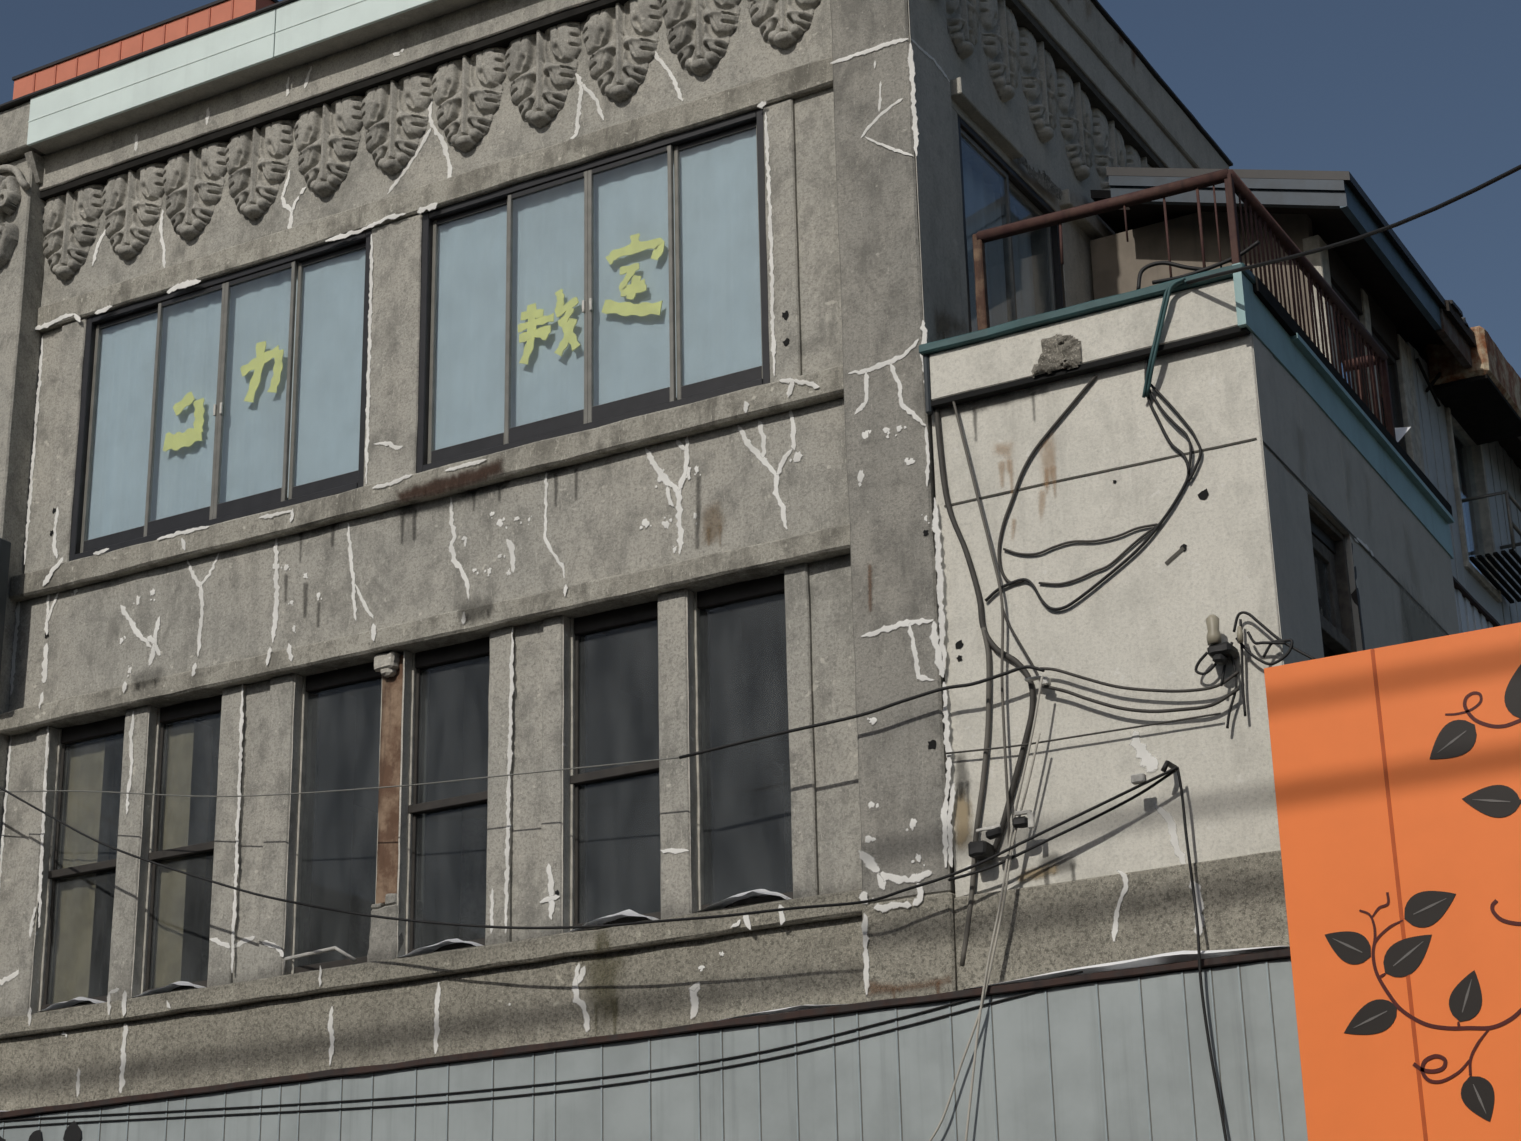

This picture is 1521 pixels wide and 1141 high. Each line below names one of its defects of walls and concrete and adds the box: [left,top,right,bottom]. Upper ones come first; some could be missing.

crack [830,38,950,156]
crack [259,509,294,665]
crack [347,523,376,641]
crack [373,441,486,624]
rust [398,460,502,500]
crack [506,472,568,596]
crack [645,436,689,554]
crack [859,618,956,995]
crack [572,963,590,1032]